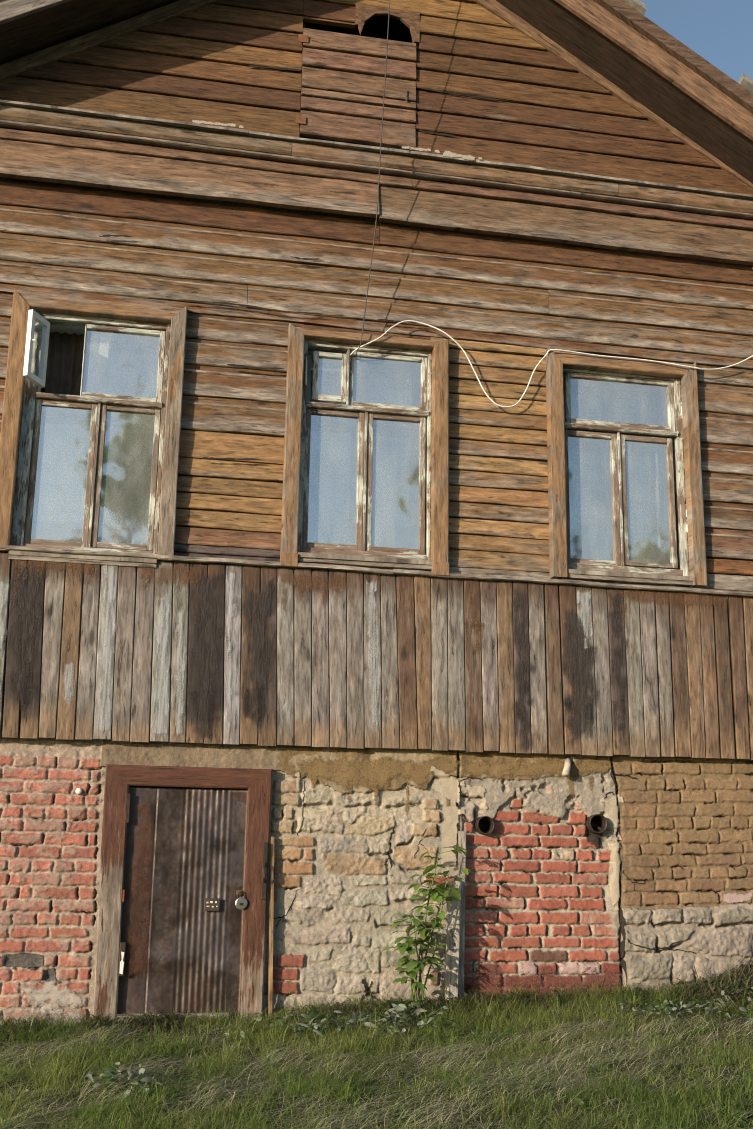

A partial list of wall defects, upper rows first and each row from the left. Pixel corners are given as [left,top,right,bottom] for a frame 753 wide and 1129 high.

crack [384,827,426,870]
flaking render [600,794,624,911]